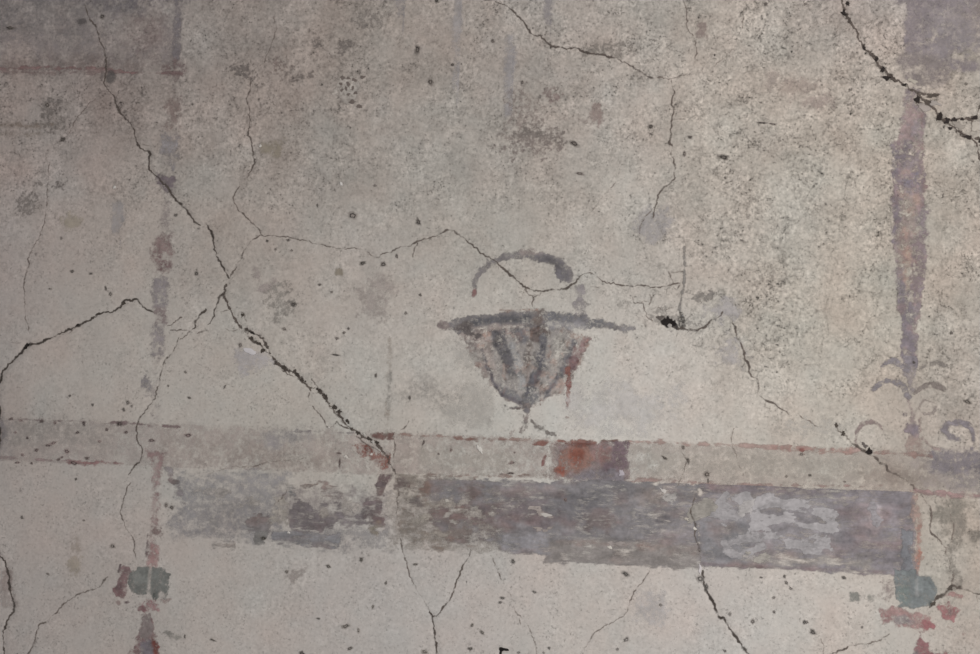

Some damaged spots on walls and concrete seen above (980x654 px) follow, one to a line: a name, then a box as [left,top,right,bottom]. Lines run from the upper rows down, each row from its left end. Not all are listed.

crack [489,0,676,218]
crack [841,0,980,160]
crack [0,7,406,555]
crack [382,229,812,423]
crack [835,423,914,487]
crack [0,556,15,654]
crack [28,578,106,654]
crack [429,555,470,653]
crack [690,497,749,654]
crack [930,507,954,552]
crack [929,576,980,608]